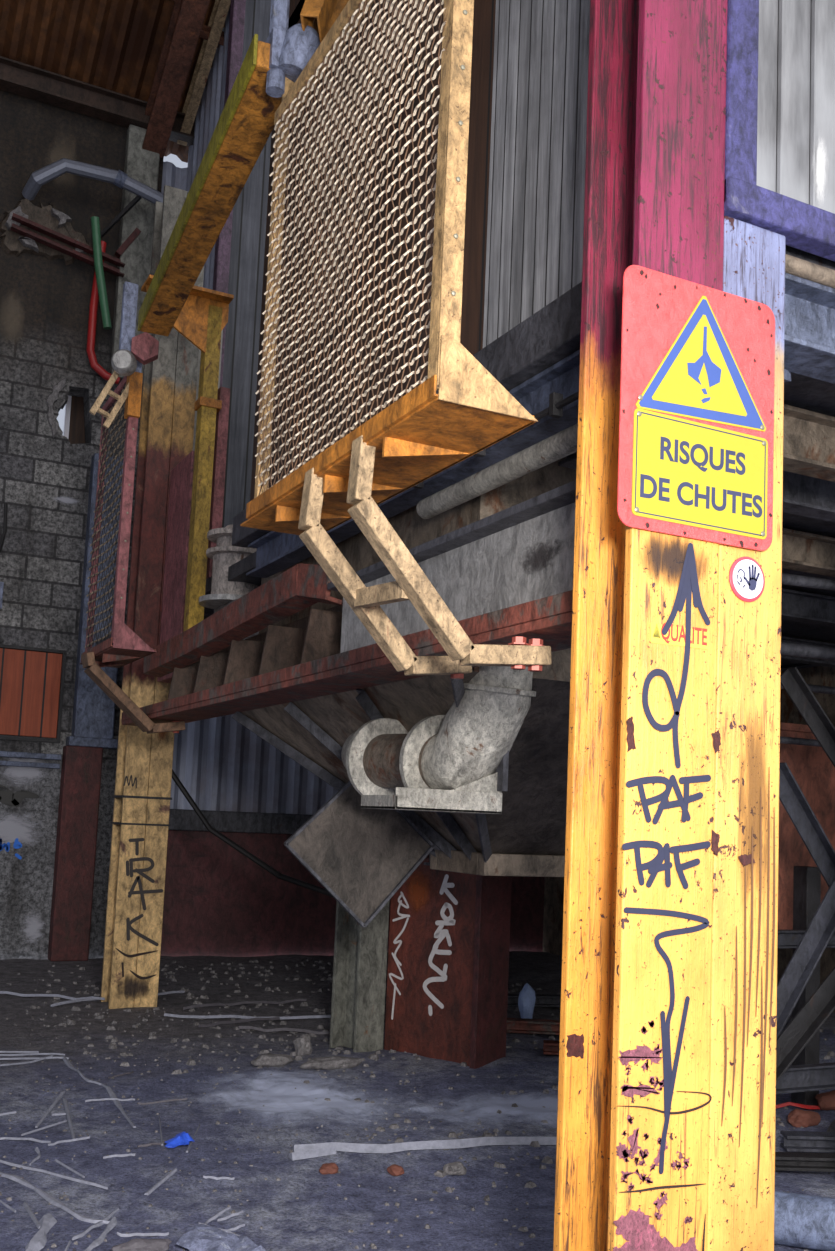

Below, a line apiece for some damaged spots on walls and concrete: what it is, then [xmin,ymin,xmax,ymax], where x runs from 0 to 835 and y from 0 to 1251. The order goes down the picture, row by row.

spalling [0,198,91,265]
peeling [618,1021,664,1098]
peeling [613,1115,698,1251]